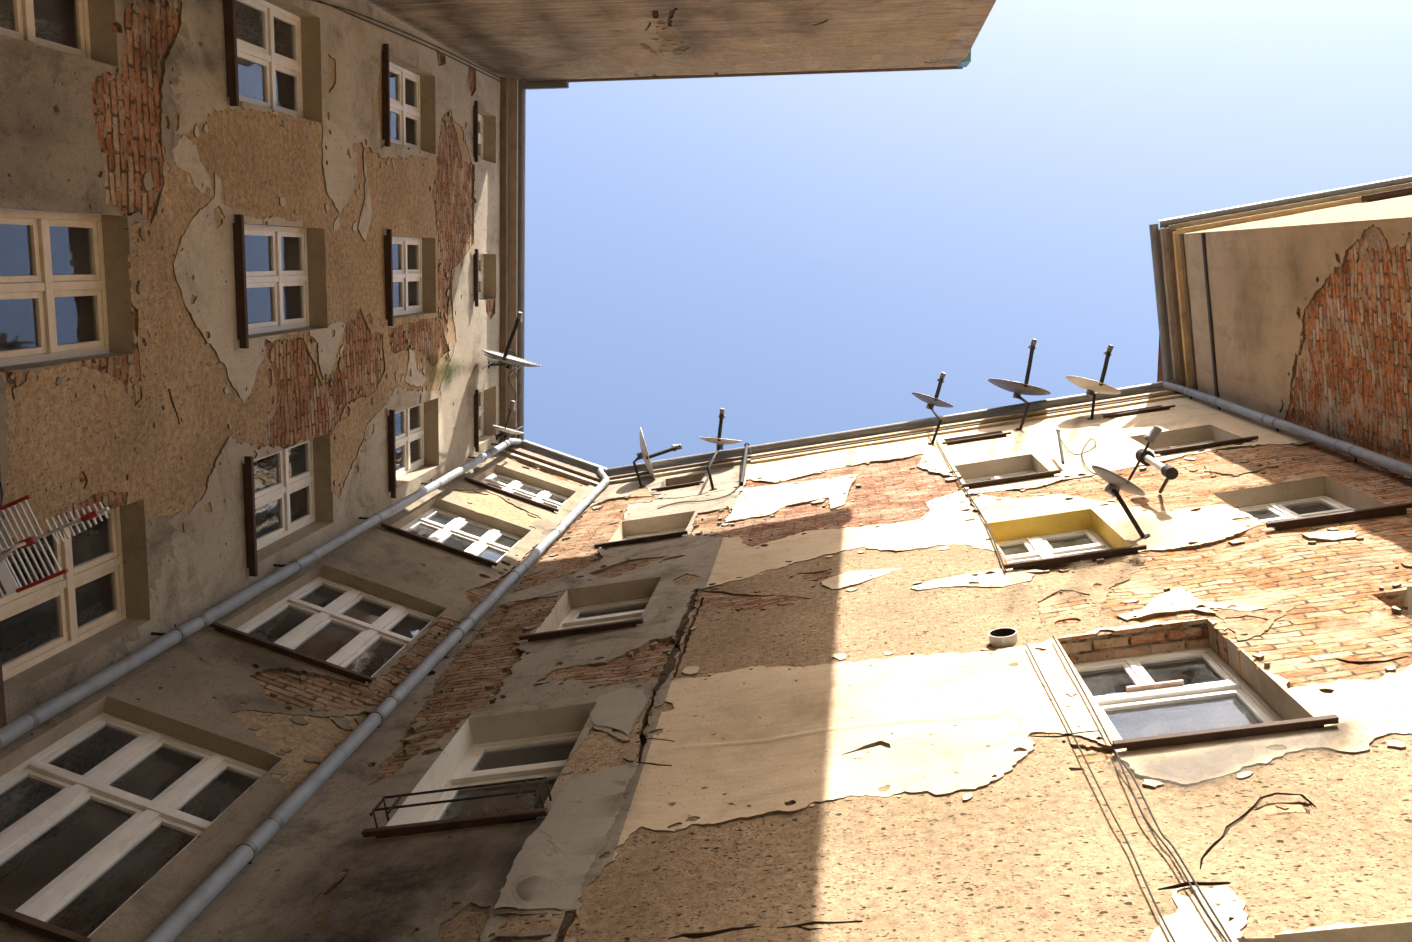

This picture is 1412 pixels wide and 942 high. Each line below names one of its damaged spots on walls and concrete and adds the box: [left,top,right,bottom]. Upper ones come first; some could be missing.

flaking render [0,0,477,542]
flaking render [232,224,1412,797]
crack [636,588,704,766]
crack [555,911,576,942]
flaking render [438,732,1412,942]